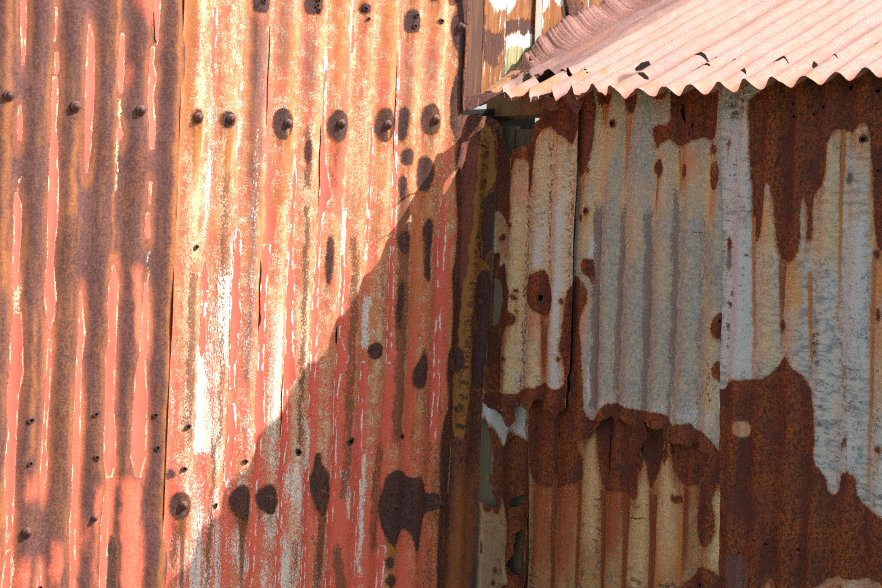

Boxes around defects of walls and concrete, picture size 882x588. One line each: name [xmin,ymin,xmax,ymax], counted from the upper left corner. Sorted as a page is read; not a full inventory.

rust [252,0,270,13]
rust [304,0,324,16]
rust [327,109,349,143]
rust [374,0,467,214]
rust [446,70,882,588]
rust [378,406,460,588]
rust [106,535,119,588]